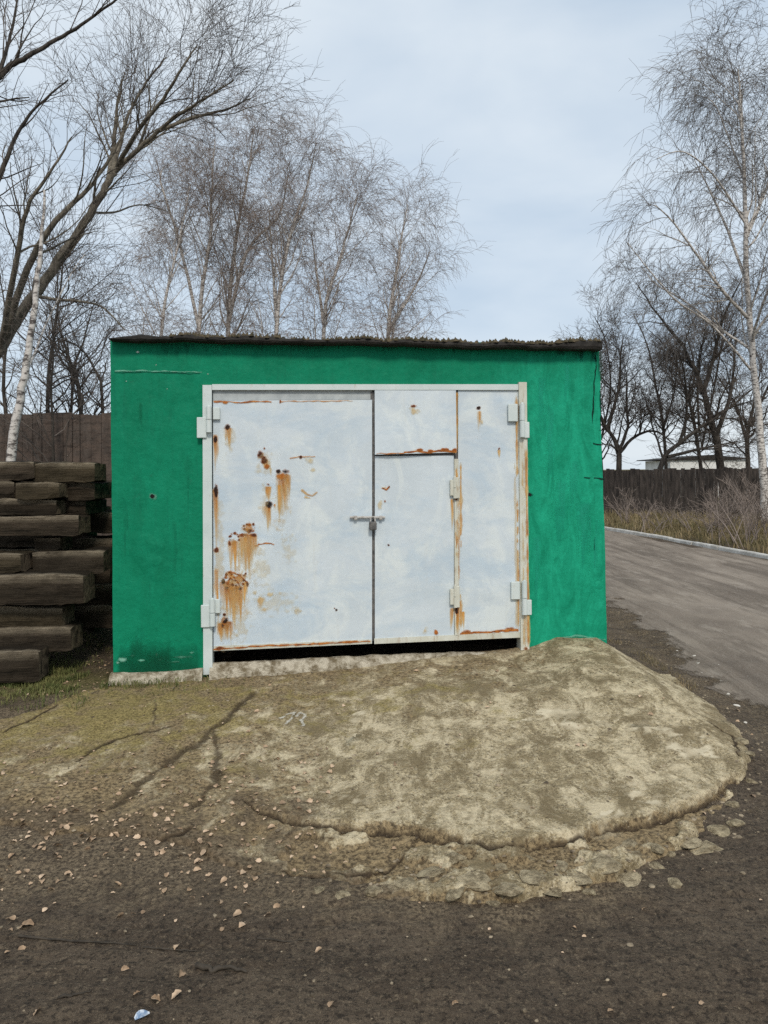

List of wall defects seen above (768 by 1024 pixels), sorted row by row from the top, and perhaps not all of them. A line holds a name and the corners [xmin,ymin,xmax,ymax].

rust [213,424,231,455]
rust [213,448,371,650]
rust [450,421,530,650]